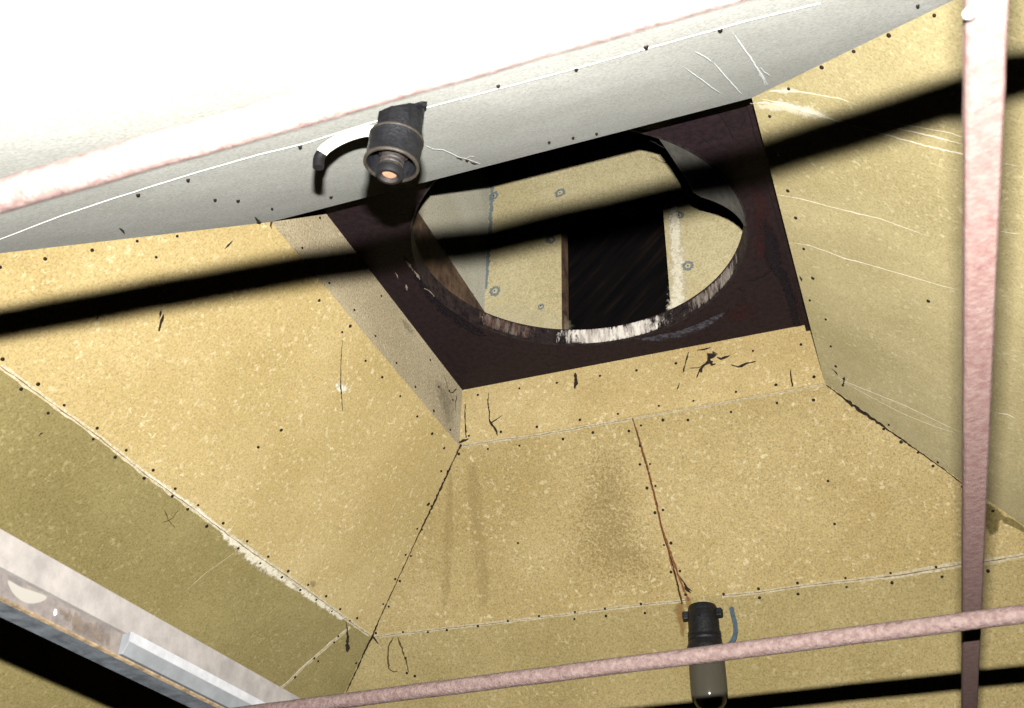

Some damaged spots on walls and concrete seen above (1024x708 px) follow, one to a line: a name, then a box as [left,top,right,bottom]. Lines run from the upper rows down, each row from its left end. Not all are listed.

crack [337,340,345,411]
crack [677,347,756,389]
crack [346,377,501,692]
crack [632,418,692,604]
corrosion [634,424,690,635]